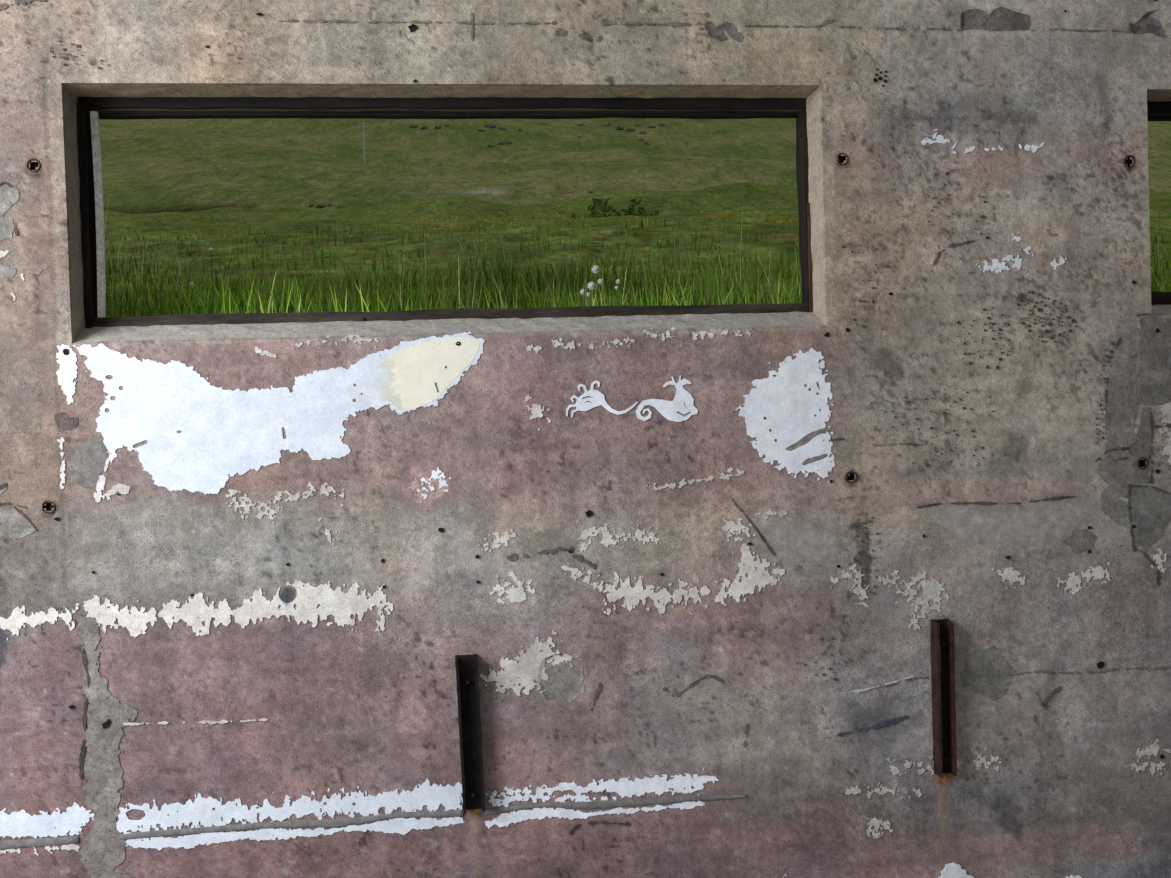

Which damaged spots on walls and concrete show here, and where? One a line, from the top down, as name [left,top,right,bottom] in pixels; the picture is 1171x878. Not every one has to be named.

peeling [56,332,484,524]
peeling [736,348,835,484]
spalling [1063,313,1171,573]
peeling [0,580,393,640]
peeling [489,571,535,604]
peeling [561,509,787,615]
peeling [480,630,579,701]
crack [79,648,90,786]
peeling [0,802,95,855]
peeling [116,778,465,850]
peeling [485,768,719,829]
peeling [939,863,974,878]